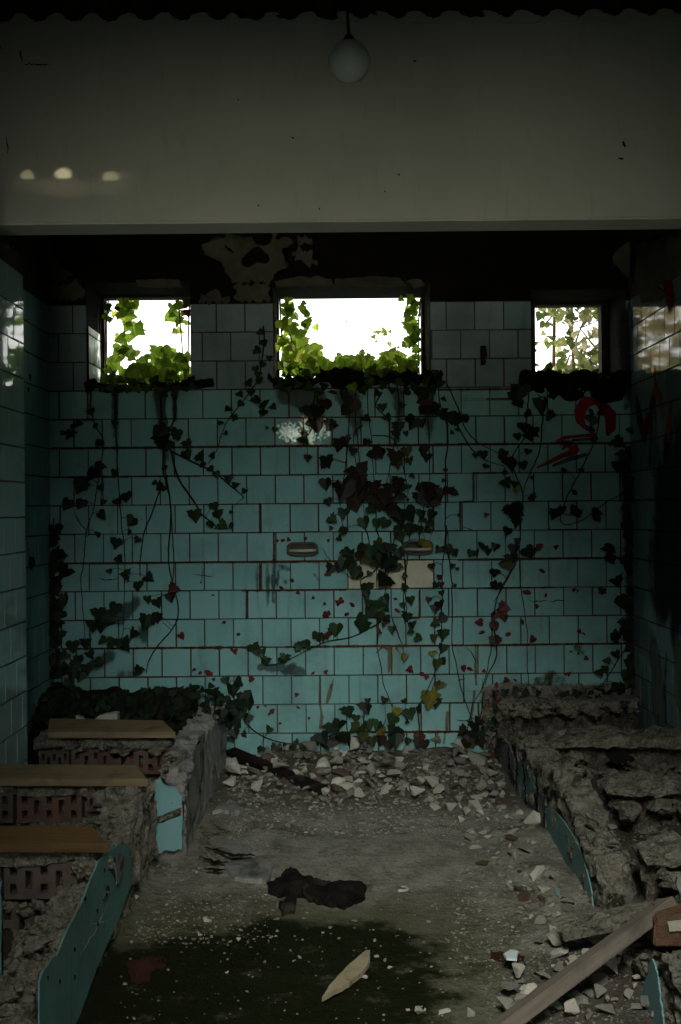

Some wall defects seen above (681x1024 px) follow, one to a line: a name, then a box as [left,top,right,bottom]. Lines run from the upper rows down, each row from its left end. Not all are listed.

flaking render [198,233,426,305]
leakage [618,309,630,372]
spalling [479,681,631,752]
flaking render [157,733,205,844]
flaking render [535,791,547,829]